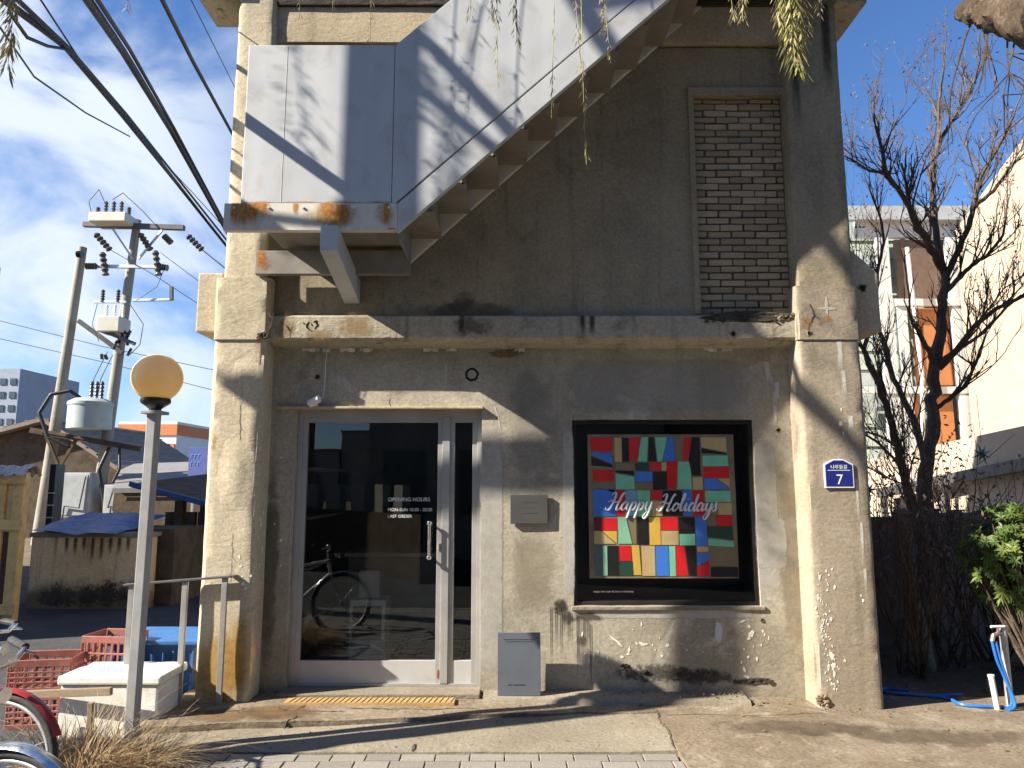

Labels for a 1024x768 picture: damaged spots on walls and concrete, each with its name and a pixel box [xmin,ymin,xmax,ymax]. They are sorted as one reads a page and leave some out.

corrosion [231,203,267,221]
corrosion [317,203,350,226]
water stain [434,304,506,330]
spalling [699,310,795,352]
water stain [550,600,602,661]
peeling [584,635,670,675]
water stain [619,664,732,685]
peeling [815,568,846,707]